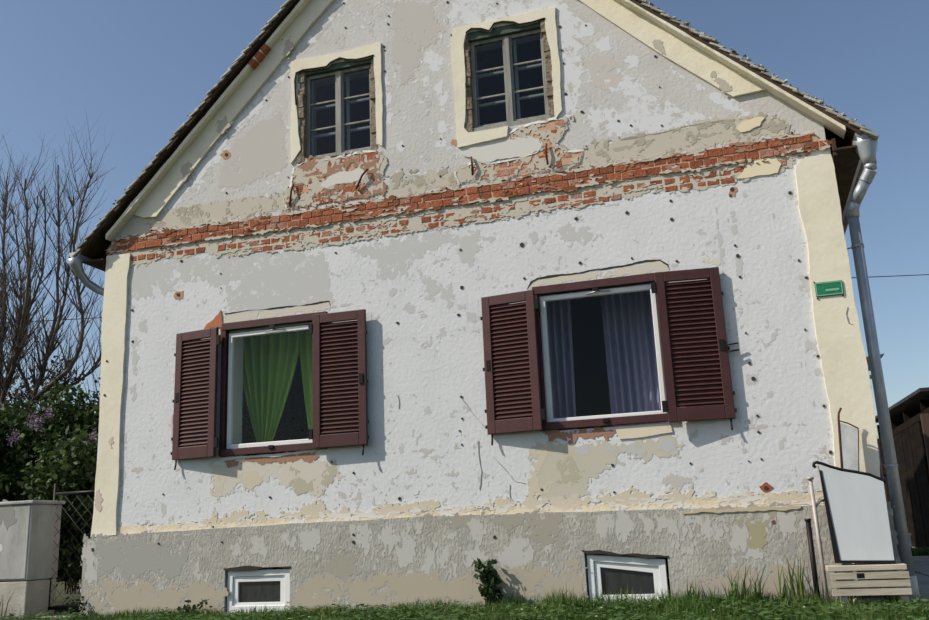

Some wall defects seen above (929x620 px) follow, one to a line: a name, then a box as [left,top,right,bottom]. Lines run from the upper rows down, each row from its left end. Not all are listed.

peeling [106,0,832,329]
spalling [202,426,763,575]
spalling [727,490,808,540]